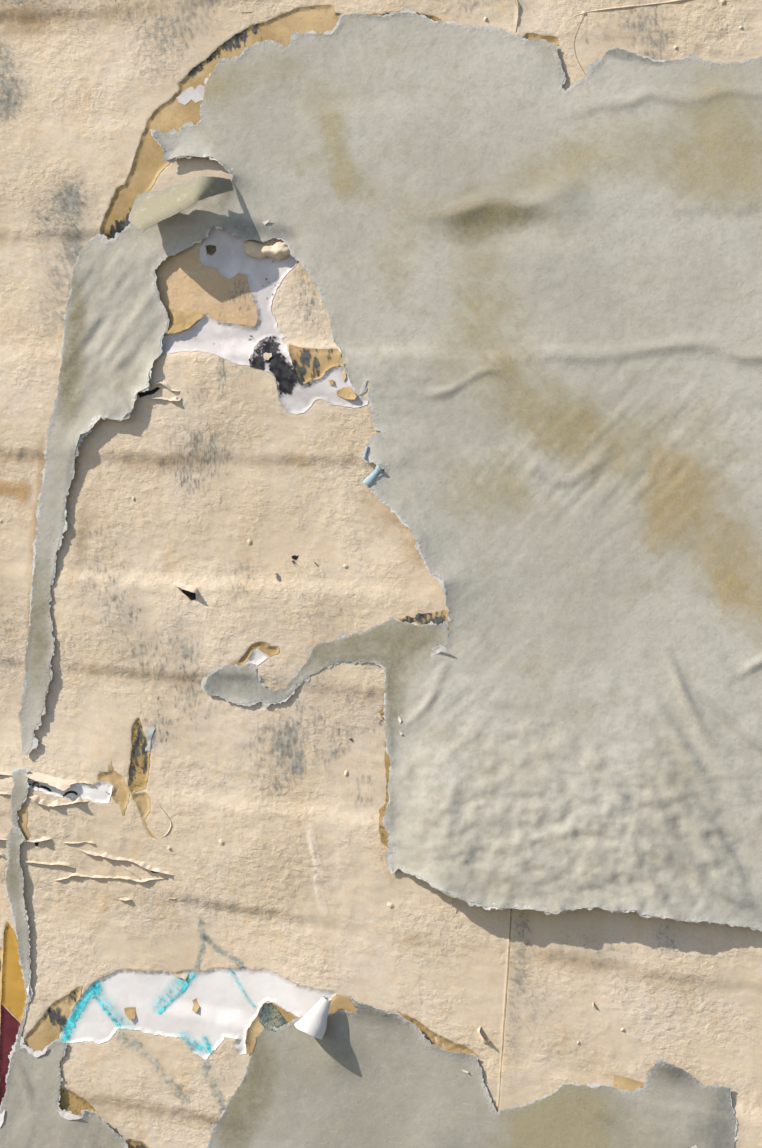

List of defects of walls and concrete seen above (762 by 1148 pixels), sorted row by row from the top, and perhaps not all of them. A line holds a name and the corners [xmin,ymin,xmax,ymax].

peeling [100,5,341,240]
peeling [162,227,368,415]
peeling [145,381,182,401]
peeling [21,968,356,1060]
peeling [397,1011,479,1061]
peeling [58,1088,95,1115]
peeling [127,1139,149,1148]